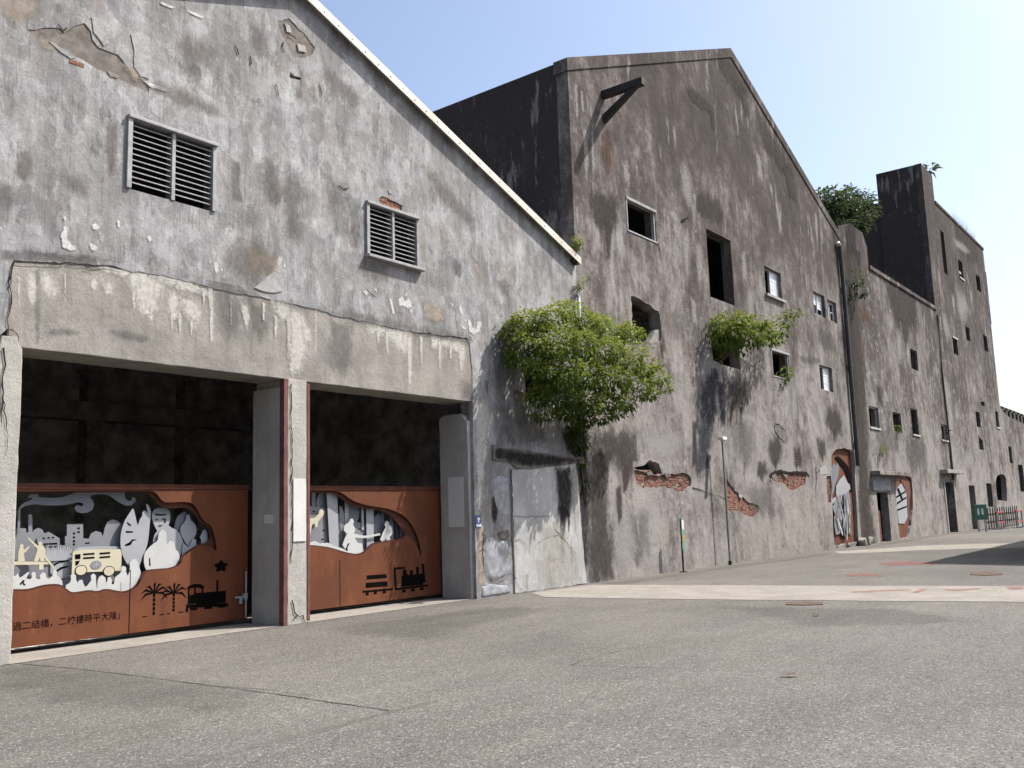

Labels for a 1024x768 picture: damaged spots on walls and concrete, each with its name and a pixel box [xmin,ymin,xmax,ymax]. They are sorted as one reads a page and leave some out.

peeling [0,0,171,92]
peeling [278,19,314,58]
peeling [61,216,76,250]
water stain [18,271,66,303]
water stain [91,265,213,342]
water stain [230,301,250,329]
crack [0,259,122,453]
water stain [262,301,317,375]
water stain [475,363,748,595]
spalling [634,464,690,493]
spalling [726,482,758,517]
spalling [771,472,805,491]